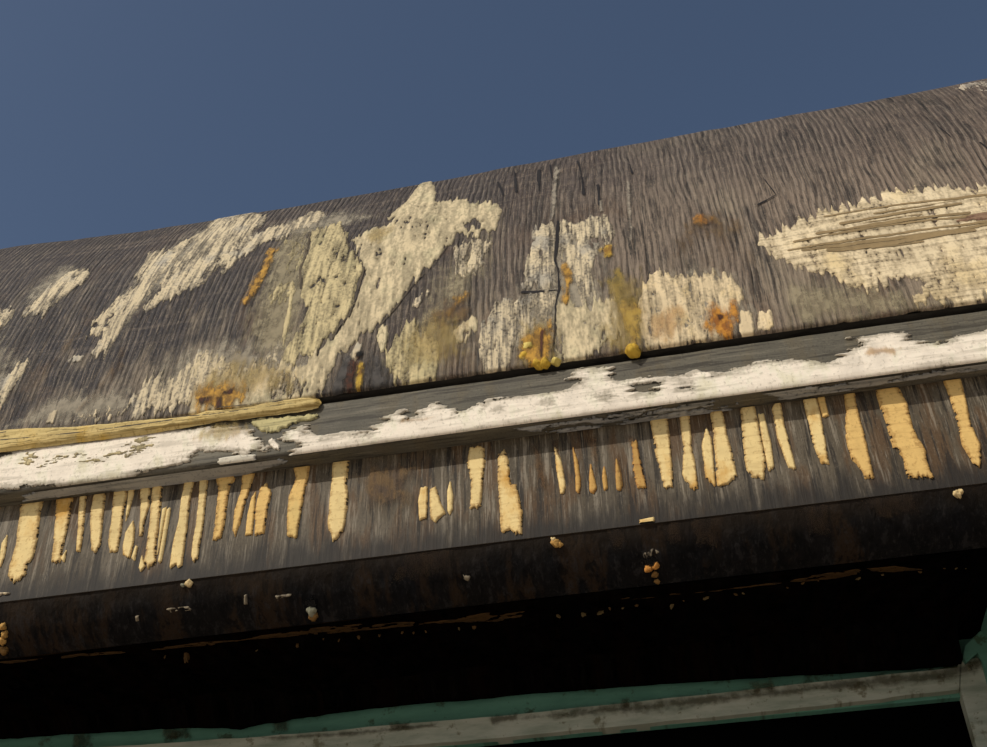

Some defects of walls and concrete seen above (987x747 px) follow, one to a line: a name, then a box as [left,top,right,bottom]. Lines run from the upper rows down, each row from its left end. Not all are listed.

peeling [958,81,987,91]
rust [243,248,275,304]
crack [521,221,569,360]
rust [561,263,572,304]
rust [522,319,553,367]
rust [705,300,738,340]
rust [195,383,246,412]
peeling [0,161,987,600]